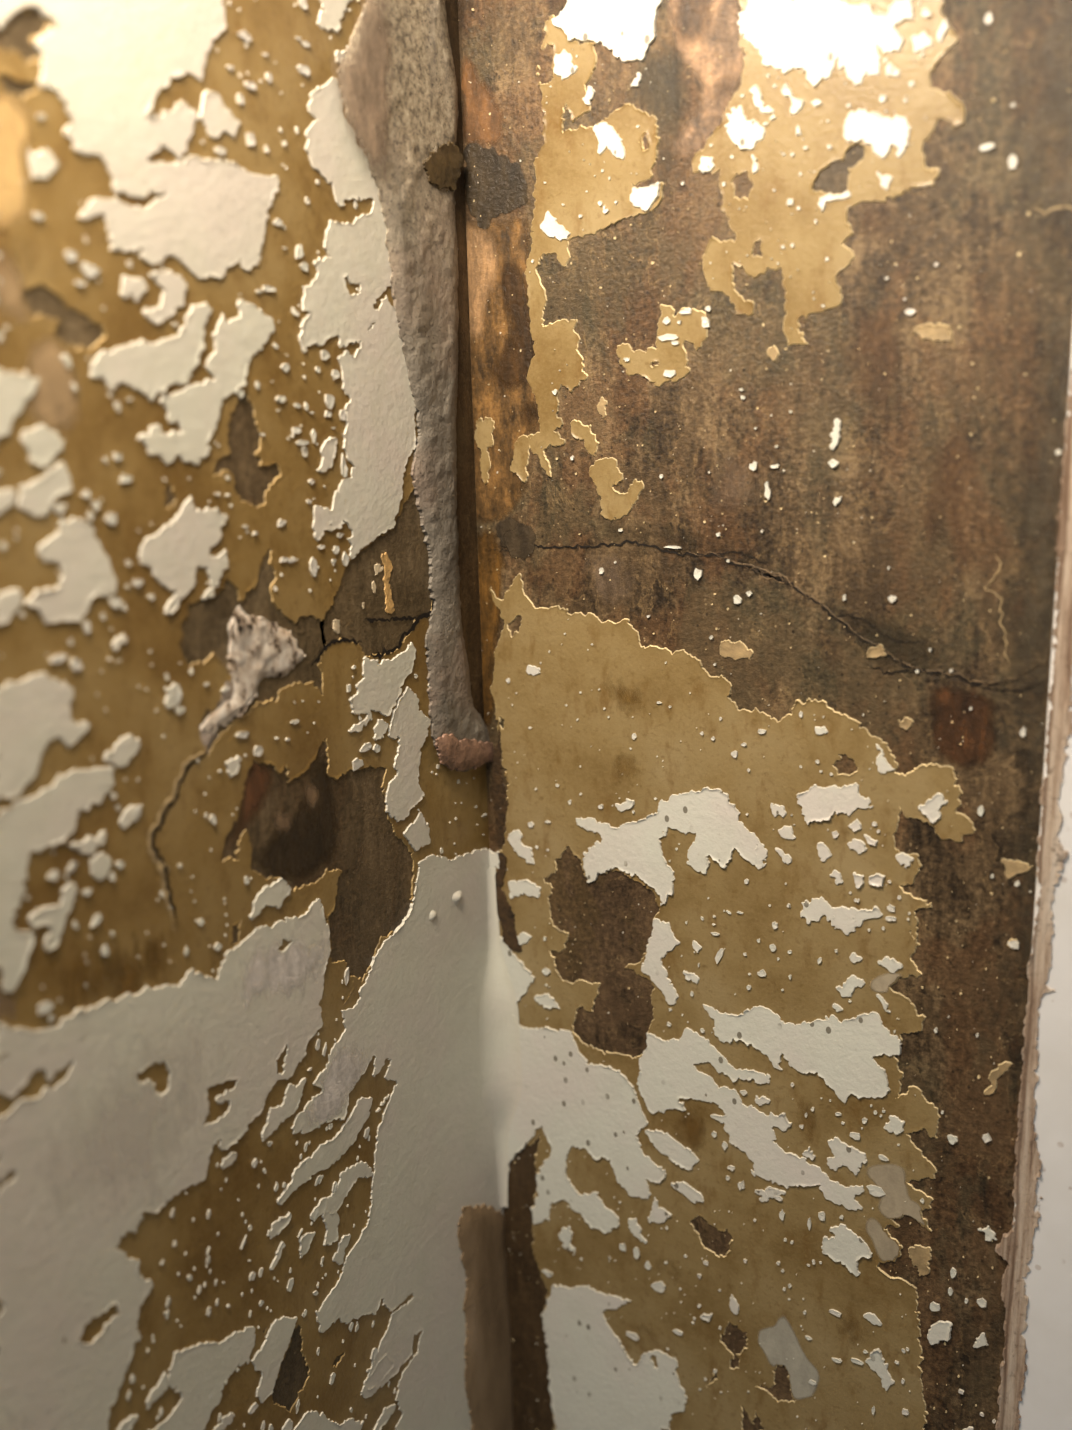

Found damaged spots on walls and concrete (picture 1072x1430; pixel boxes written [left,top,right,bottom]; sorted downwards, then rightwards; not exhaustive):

damp [635,53,681,126]
damp [677,0,711,40]
damp [463,143,527,229]
peeling [510,0,664,521]
peeling [616,0,966,387]
peeling [0,0,495,1430]
crack [310,601,434,667]
crack [486,540,1047,691]
damp [861,623,924,665]
crack [147,749,209,931]
spalling [973,371,1072,1430]
peeling [479,573,976,1430]